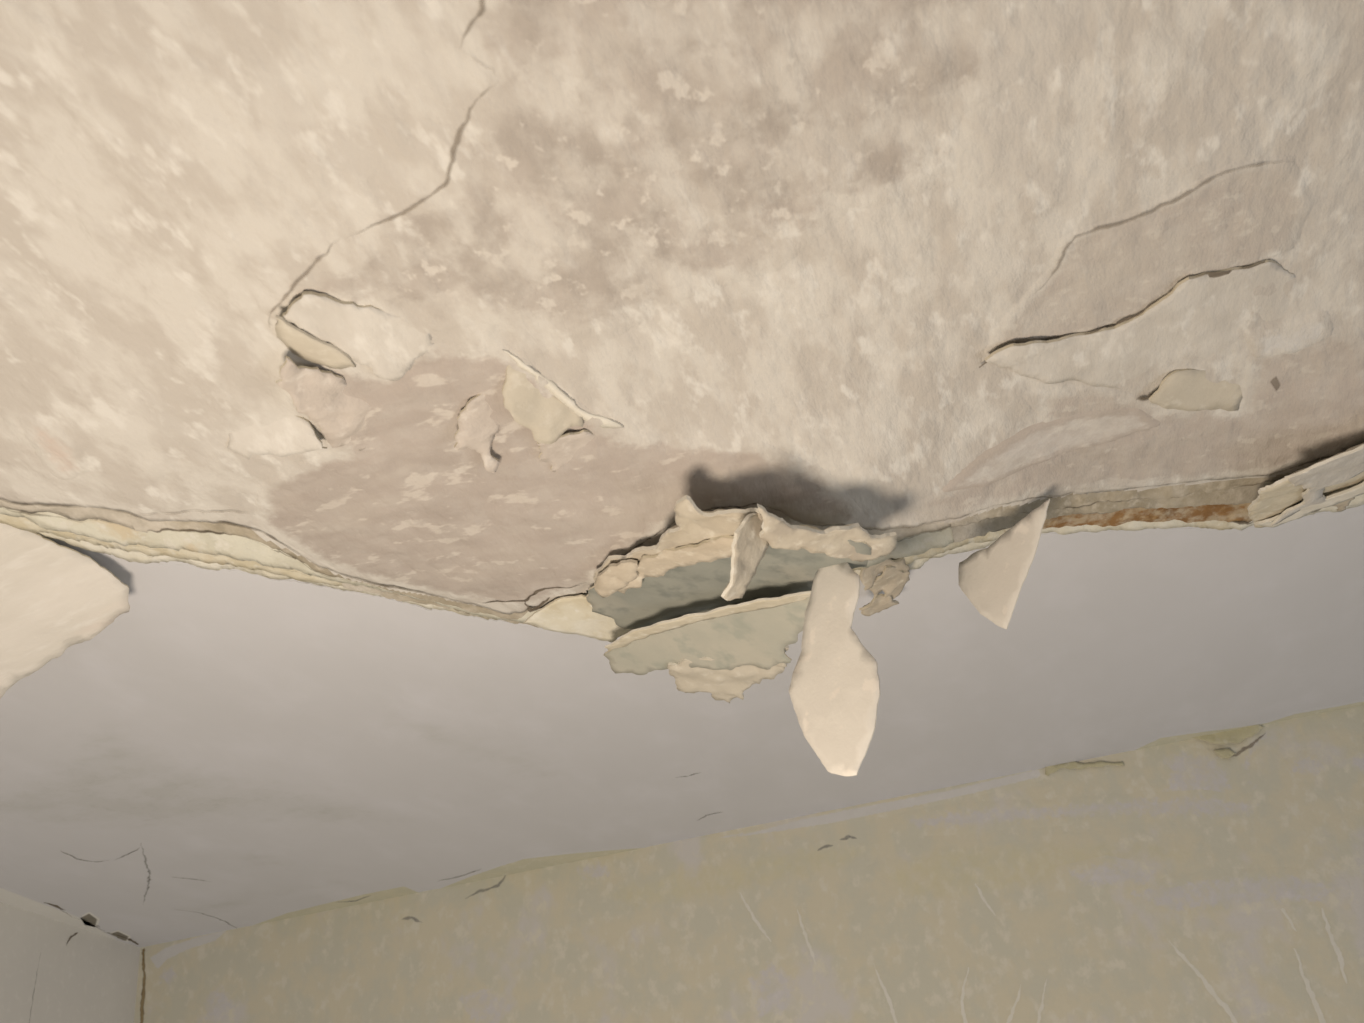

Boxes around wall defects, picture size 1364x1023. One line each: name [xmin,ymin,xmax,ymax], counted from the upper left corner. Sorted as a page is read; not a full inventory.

crack [467,0,484,32]
crack [376,115,469,225]
crack [1053,164,1264,274]
crack [273,257,322,310]
peeling [0,0,1364,777]
rust [951,469,1301,543]
water stain [127,512,541,628]